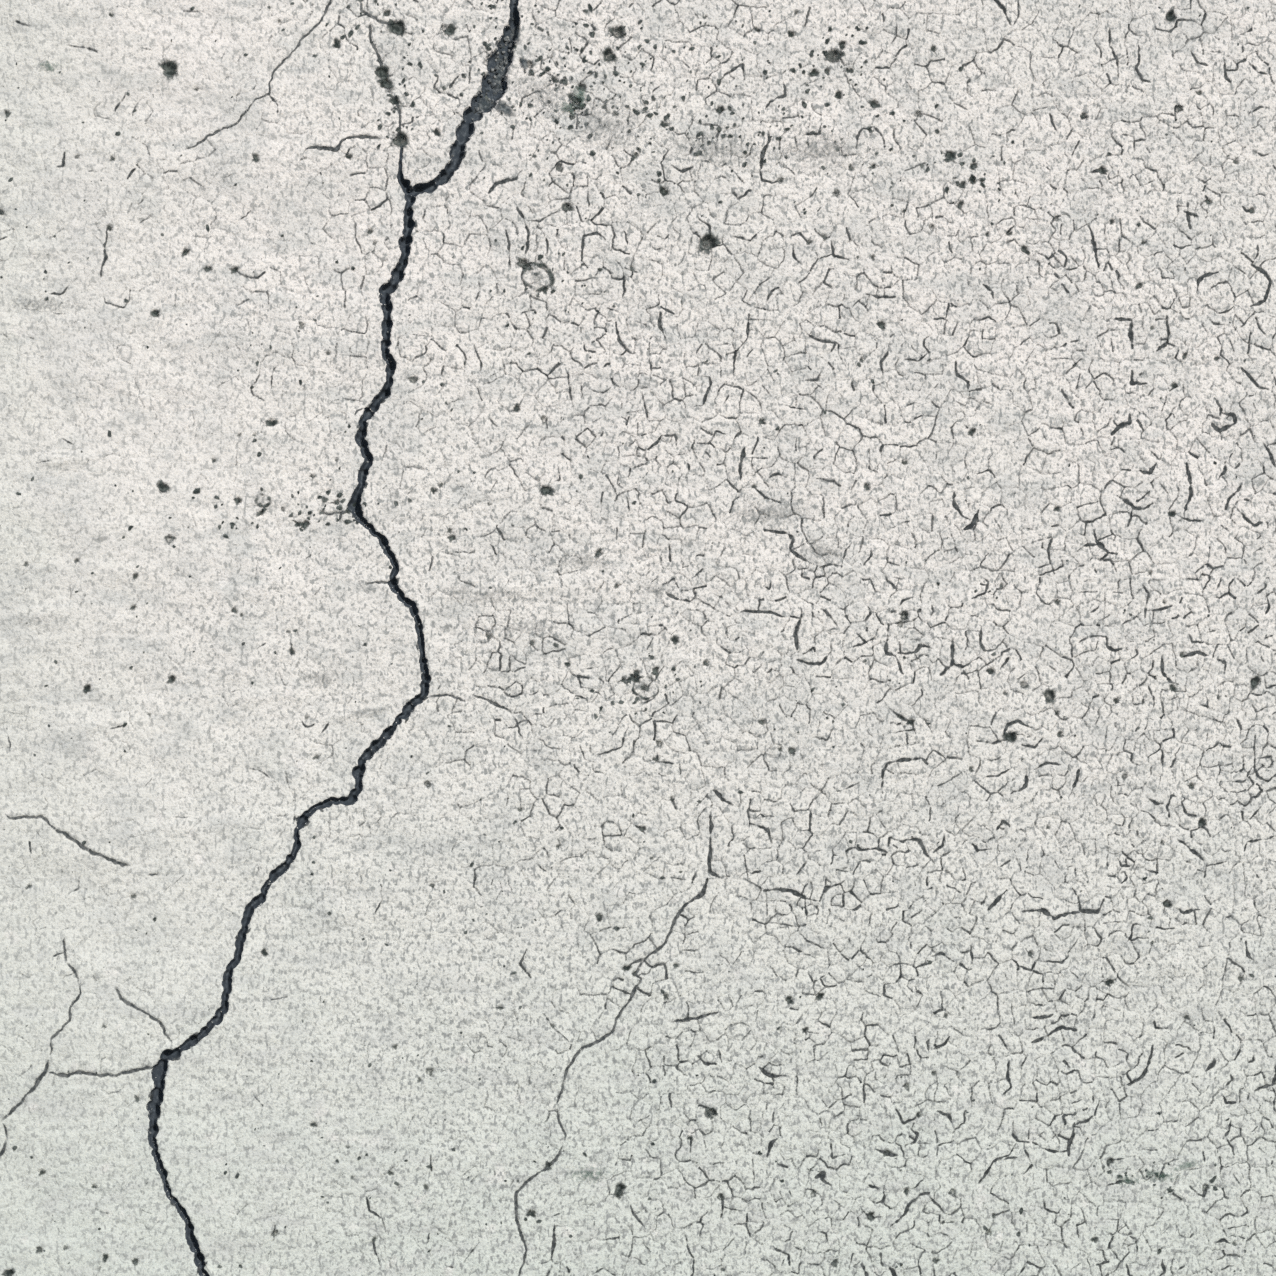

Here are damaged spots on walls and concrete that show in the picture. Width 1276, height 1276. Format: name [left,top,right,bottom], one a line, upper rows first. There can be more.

crack [859,0,940,107]
crack [1046,20,1151,91]
crack [828,126,901,156]
crack [100,230,131,308]
crack [335,268,368,345]
crack [429,507,583,584]
crack [7,815,183,891]
crack [560,814,647,874]
crack [366,1197,386,1262]
crack [541,1213,570,1276]
crack [603,1204,708,1276]
crack [994,1240,1062,1276]